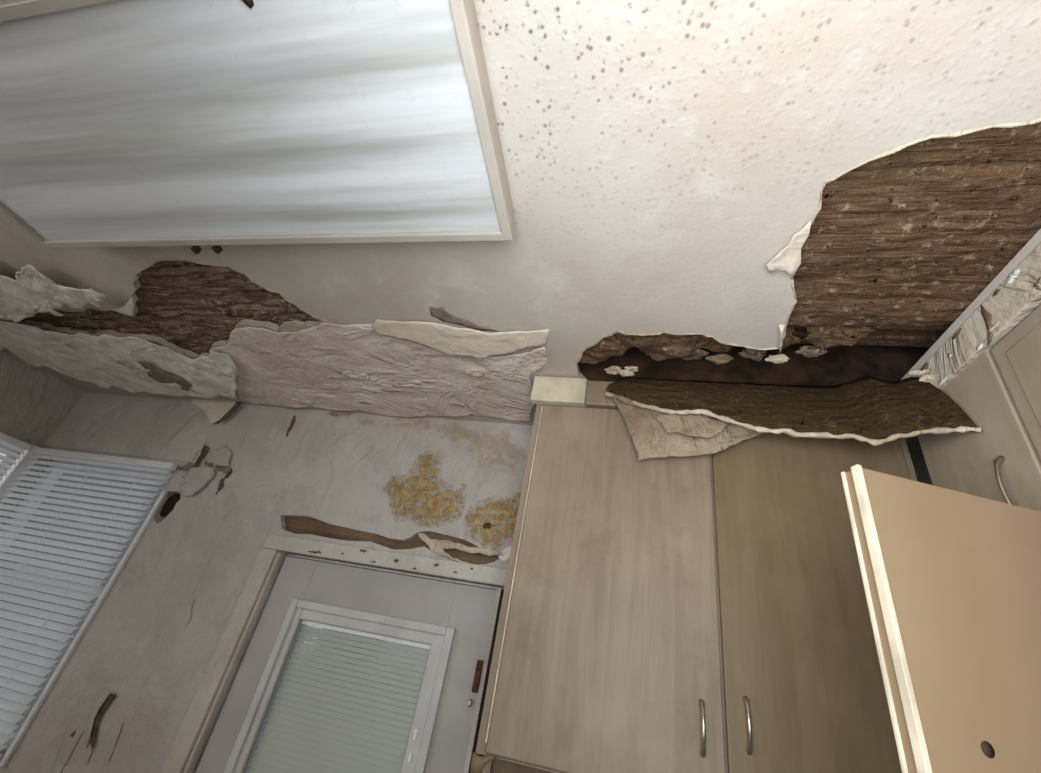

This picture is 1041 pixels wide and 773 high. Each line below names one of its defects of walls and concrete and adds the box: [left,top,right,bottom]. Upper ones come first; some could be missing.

peeling [766,220,811,277]
peeling [992,269,1020,297]
flaking render [0,264,549,424]
peeling [976,305,1000,351]
peeling [909,363,947,385]
spalling [160,483,187,517]
water stain [387,455,521,548]
spalling [284,517,511,573]